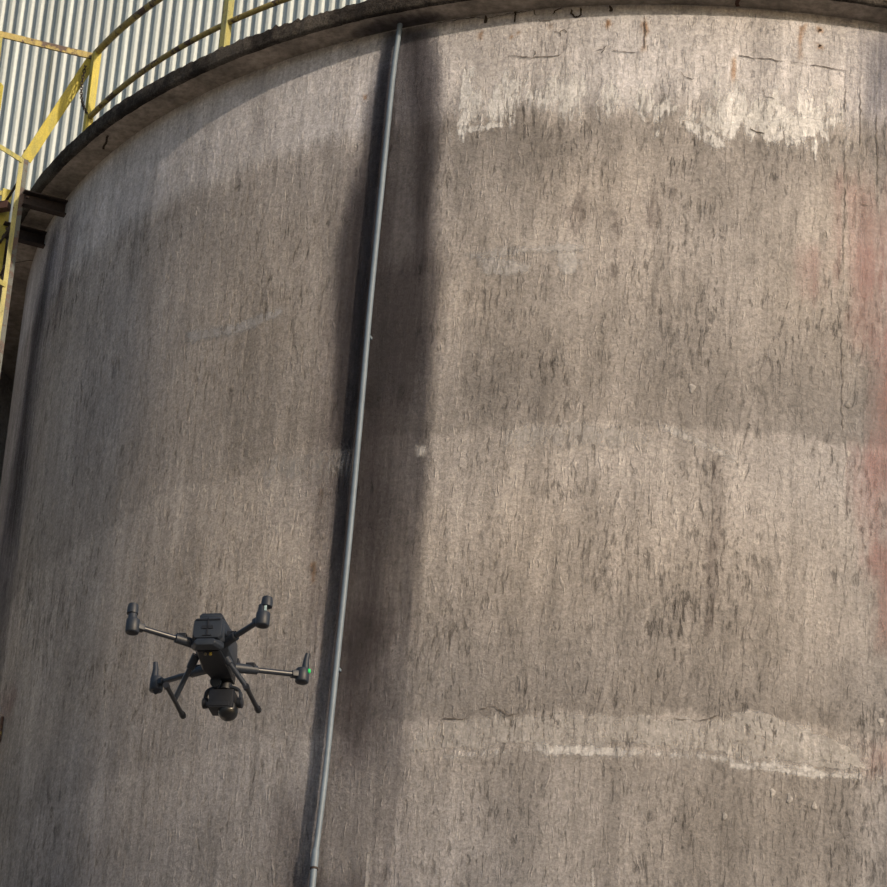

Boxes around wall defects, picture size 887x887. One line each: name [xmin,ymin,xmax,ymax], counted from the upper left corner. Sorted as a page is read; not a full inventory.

leakage [457,63,591,143]
leakage [596,69,851,160]
leakage [528,743,640,756]
leakage [697,754,861,779]